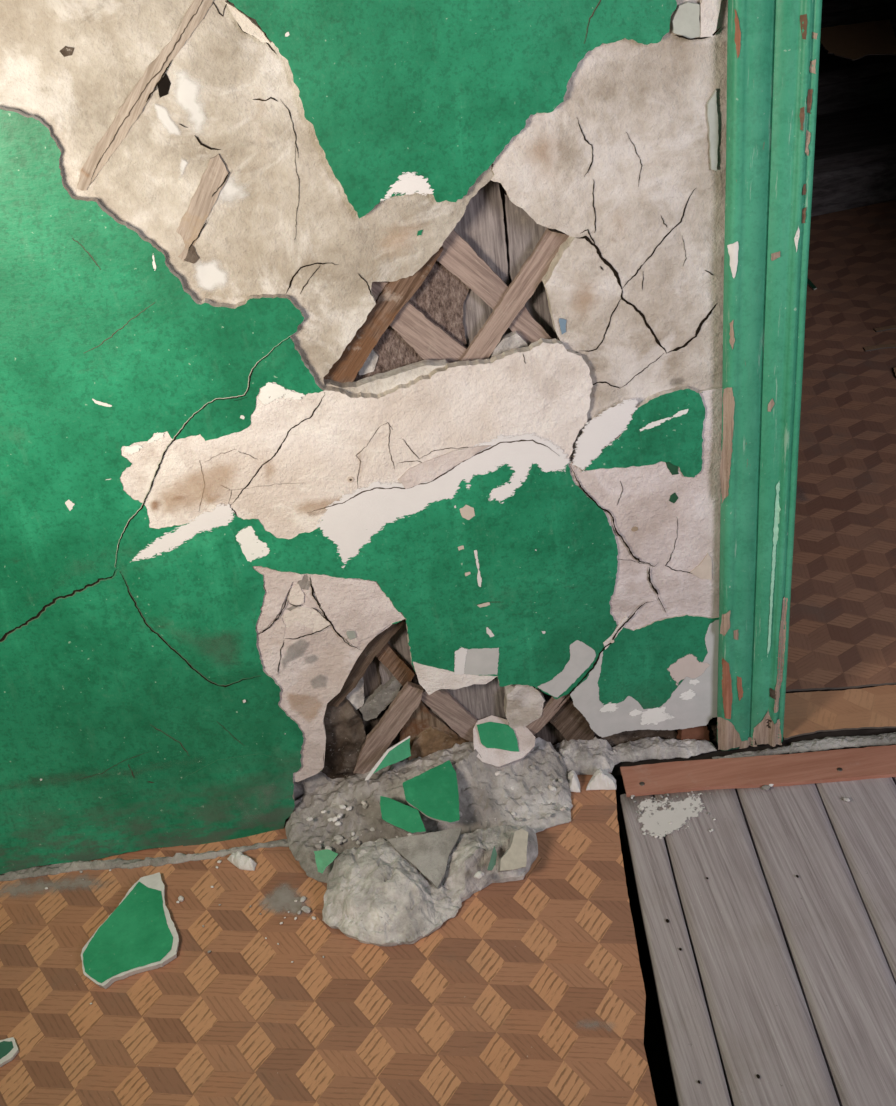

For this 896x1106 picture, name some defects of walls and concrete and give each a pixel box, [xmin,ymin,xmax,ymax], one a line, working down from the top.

crack [584,0,601,44]
crack [579,189,717,388]
crack [0,336,290,687]
crack [230,392,325,517]
flaking render [0,0,788,801]